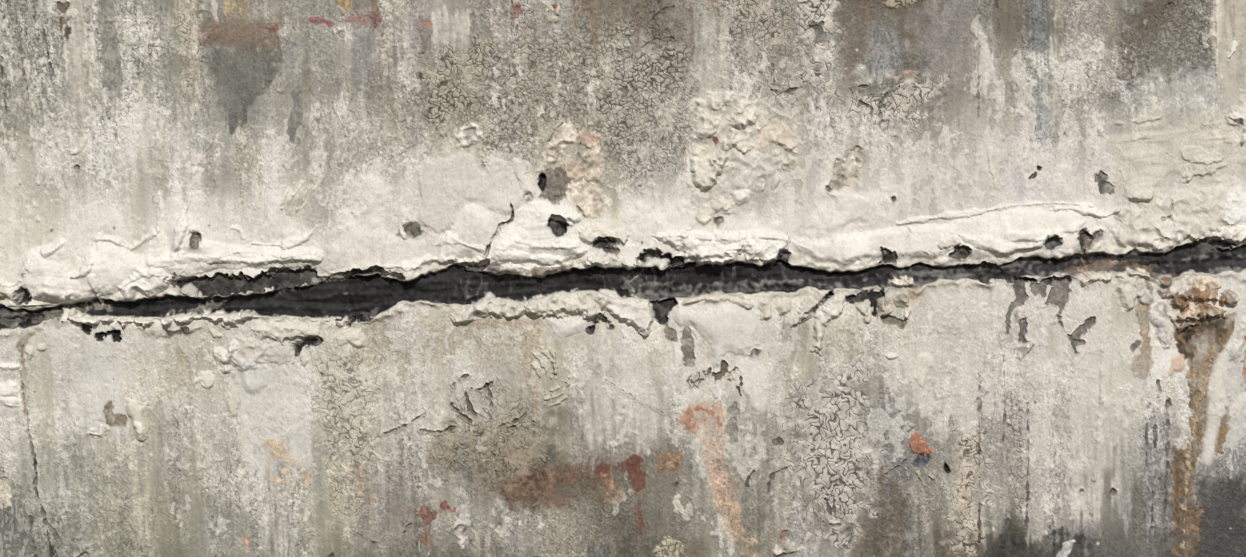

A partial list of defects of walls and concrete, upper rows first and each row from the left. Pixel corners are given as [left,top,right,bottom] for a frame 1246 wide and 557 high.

peeling [843,0,926,13]
water stain [204,47,283,135]
flaking render [524,121,609,219]
flaking render [1005,275,1096,359]
corrosion [1131,267,1156,380]
crack [0,203,1246,557]
corrosion [1170,277,1240,557]
corrosion [492,450,683,535]
corrosion [676,400,762,557]
water stain [984,517,1095,557]